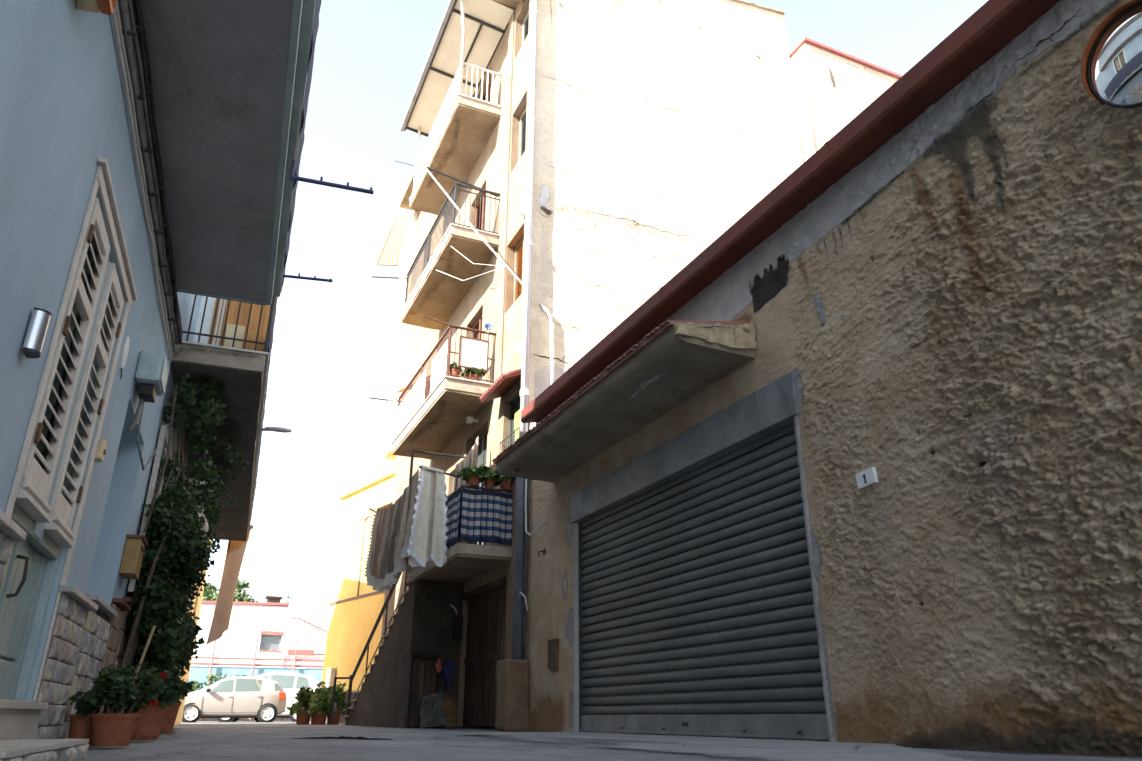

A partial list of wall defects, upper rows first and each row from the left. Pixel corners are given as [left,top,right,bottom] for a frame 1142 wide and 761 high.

crack [966,8,1082,113]
crack [543,151,713,264]
damp [749,254,789,313]
rust [910,169,940,236]
damp [924,98,1008,214]
rust [950,172,991,296]
damp [835,691,1142,756]